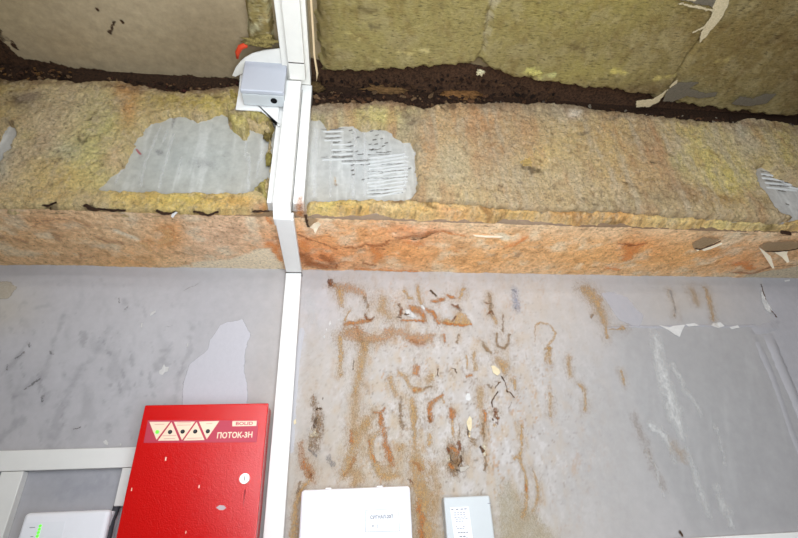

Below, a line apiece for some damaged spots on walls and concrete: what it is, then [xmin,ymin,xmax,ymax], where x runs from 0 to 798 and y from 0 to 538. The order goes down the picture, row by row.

corrosion [298,234,338,269]
corrosion [347,230,466,272]
spalling [692,237,722,251]
spalling [759,241,798,269]
corrosion [327,279,472,394]
corrosion [484,293,511,373]
leakage [654,334,683,437]
corrosion [289,442,315,538]
corrosion [342,365,499,538]
corrosion [514,425,539,517]